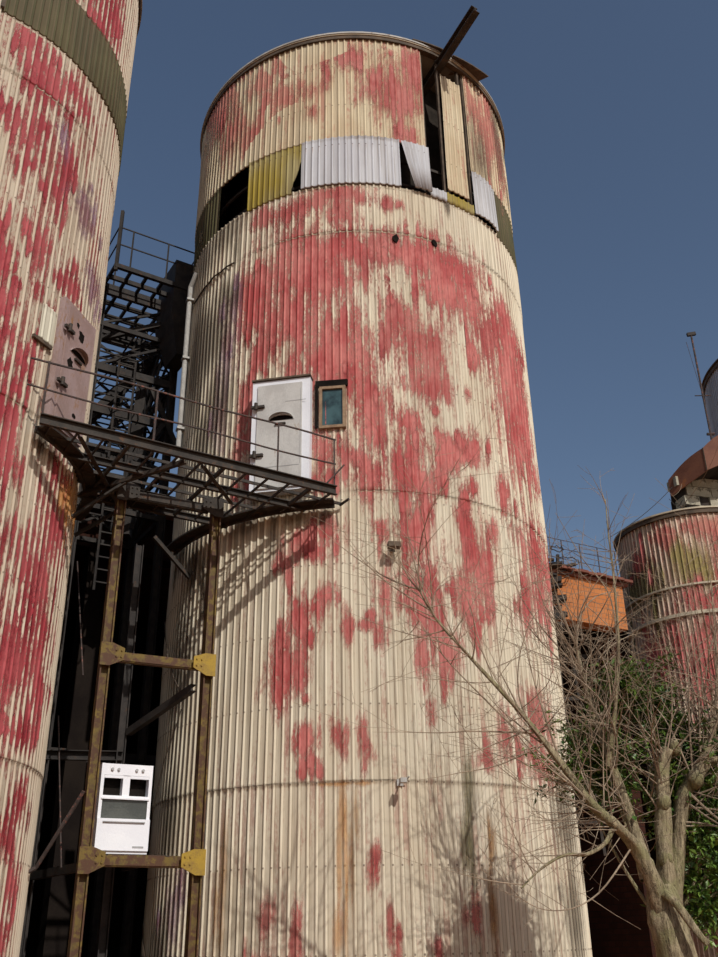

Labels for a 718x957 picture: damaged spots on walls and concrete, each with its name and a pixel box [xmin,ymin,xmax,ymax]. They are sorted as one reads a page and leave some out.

peeling [76,0,128,60]
peeling [207,40,423,159]
peeling [464,79,506,201]
peeling [225,185,554,726]
peeling [0,24,103,957]
peeling [630,513,718,710]
peeling [291,716,373,782]
peeling [367,840,381,886]
peeling [243,900,276,957]
peeling [288,905,303,957]
peeling [387,905,402,957]